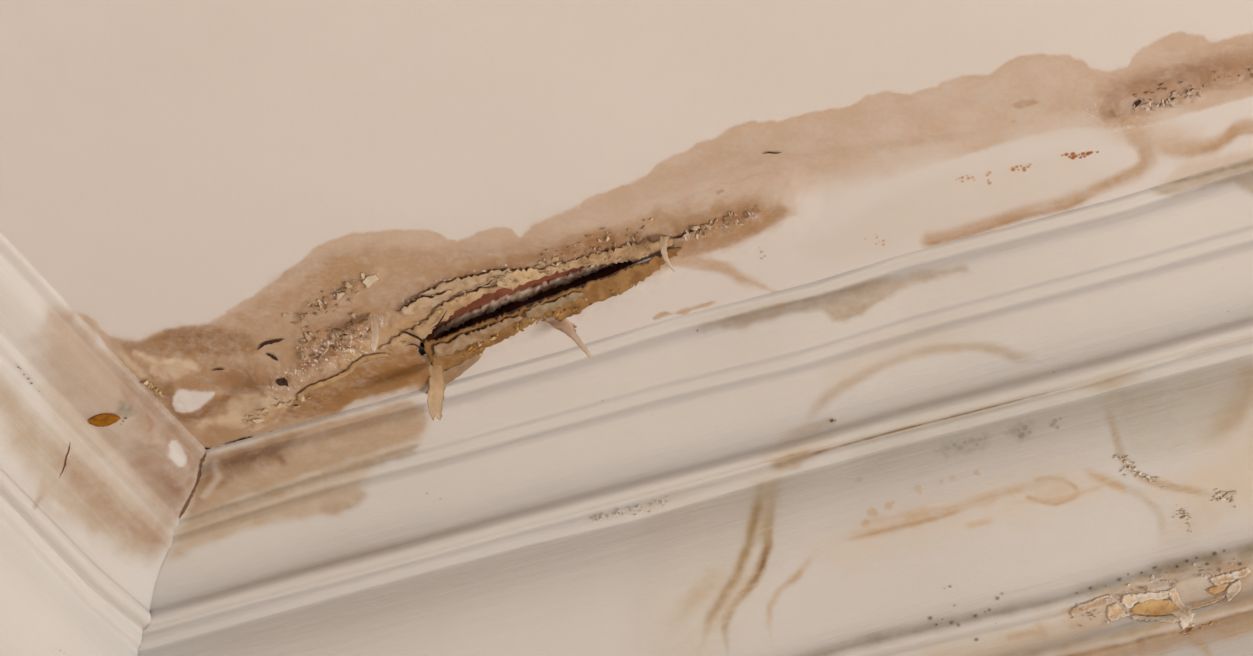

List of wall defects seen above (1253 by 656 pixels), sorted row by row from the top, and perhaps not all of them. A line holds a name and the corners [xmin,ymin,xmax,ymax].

spalling [283,205,761,421]
crack [257,339,389,401]
rust [88,413,121,427]
crack [138,437,251,652]
spalling [1064,563,1251,636]